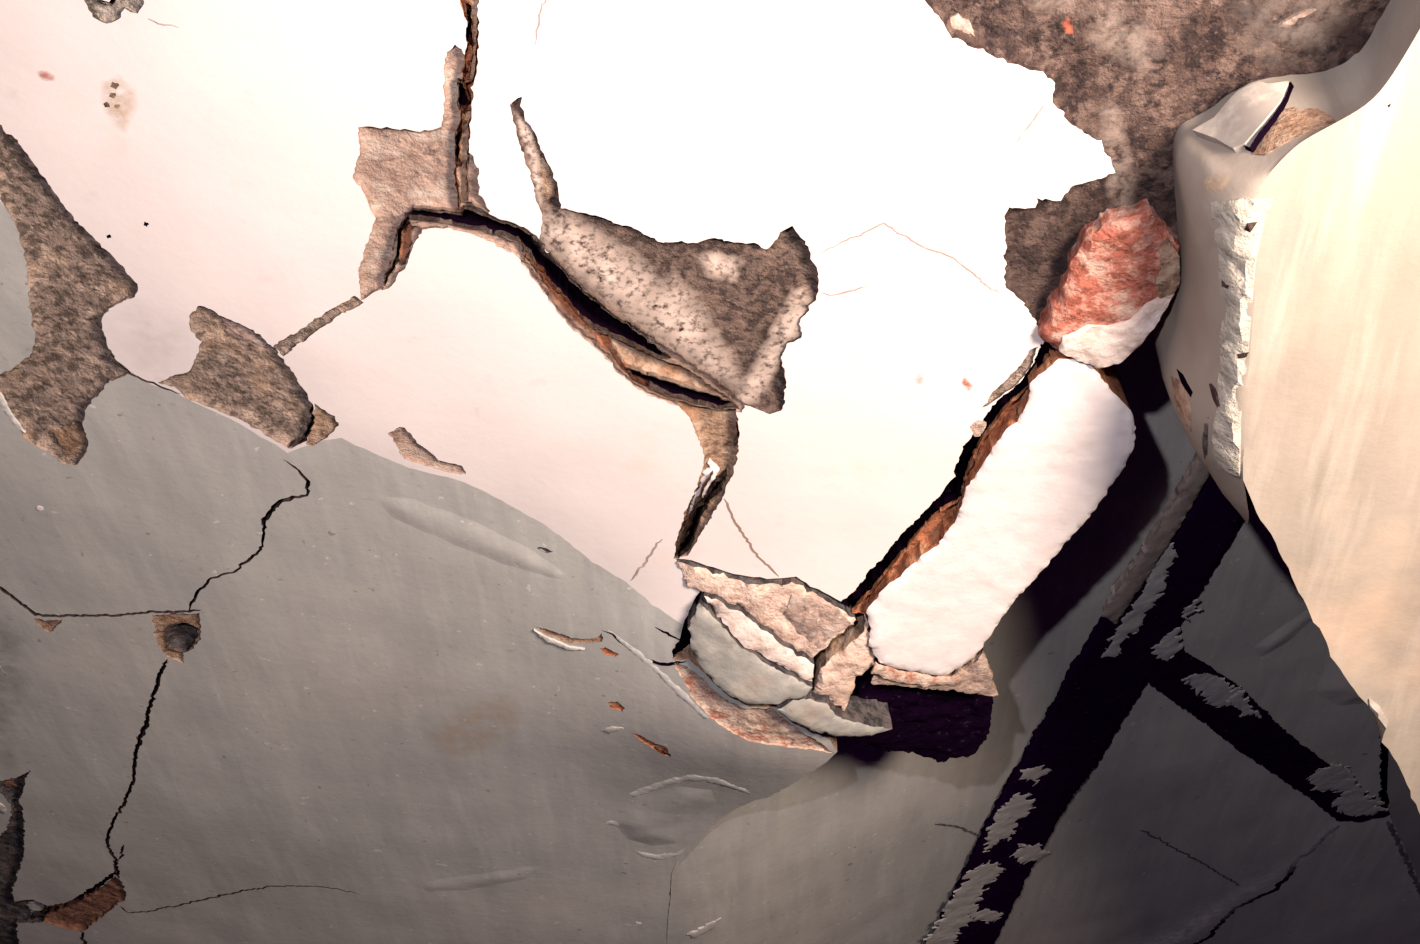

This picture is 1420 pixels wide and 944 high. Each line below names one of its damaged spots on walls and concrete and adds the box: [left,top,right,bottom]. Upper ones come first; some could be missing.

spalling [84,0,144,23]
spalling [0,125,339,465]
spalling [353,45,490,300]
crack [382,0,779,581]
spalling [510,97,819,414]
spalling [925,0,1390,326]
crack [0,459,310,633]
spalling [388,427,466,474]
crack [652,591,701,666]
crack [840,318,1056,614]
spalling [0,770,126,944]
crack [105,657,357,913]